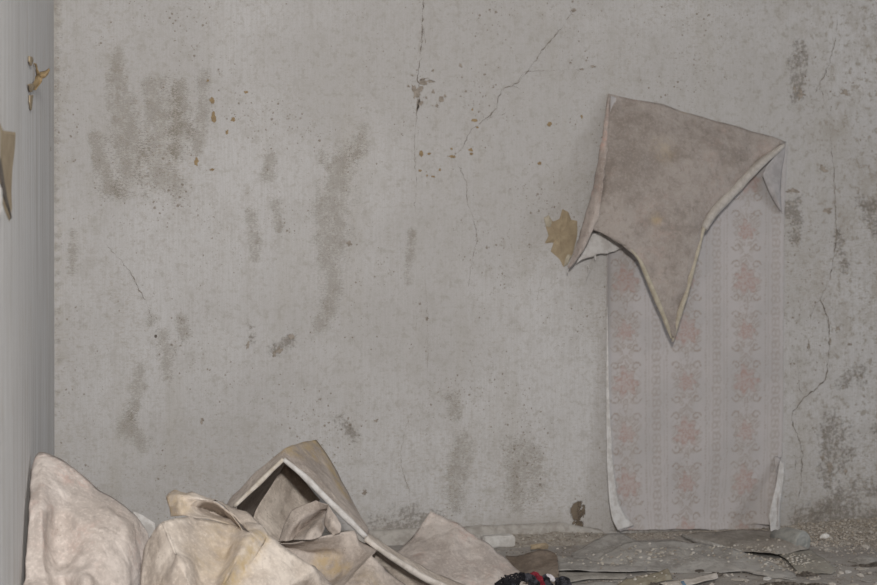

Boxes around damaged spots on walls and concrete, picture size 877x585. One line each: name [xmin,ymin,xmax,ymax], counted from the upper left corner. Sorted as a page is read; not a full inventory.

flaking render [0,124,16,221]
peeling [28,56,50,110]
crack [414,0,435,156]
crack [457,11,584,280]
peeling [544,209,577,267]
crack [792,31,838,517]